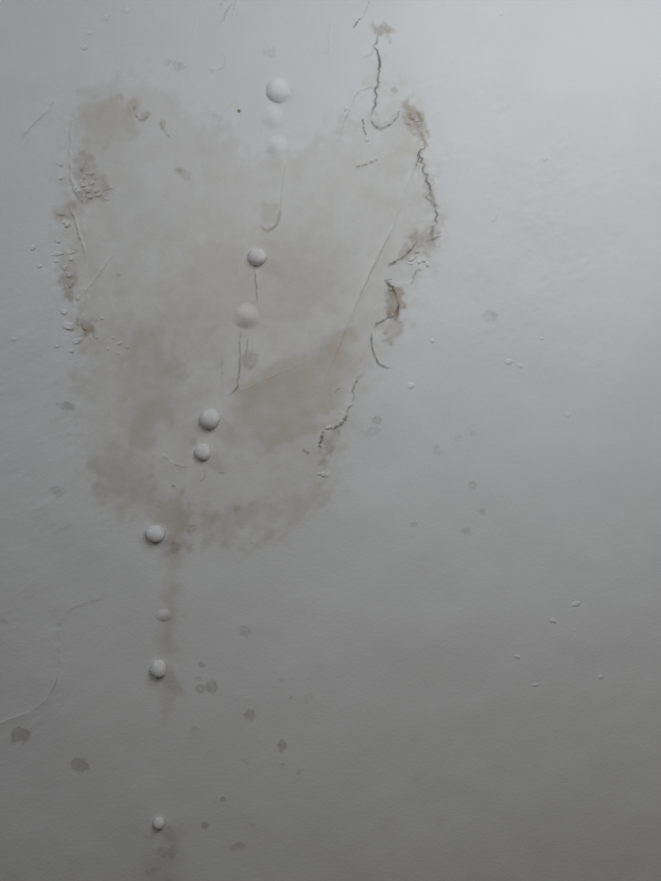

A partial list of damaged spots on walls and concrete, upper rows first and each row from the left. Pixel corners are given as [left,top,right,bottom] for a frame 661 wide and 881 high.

crack [339,30,401,139]
crack [415,133,452,252]
leakage [28,47,465,733]
crack [301,276,401,459]